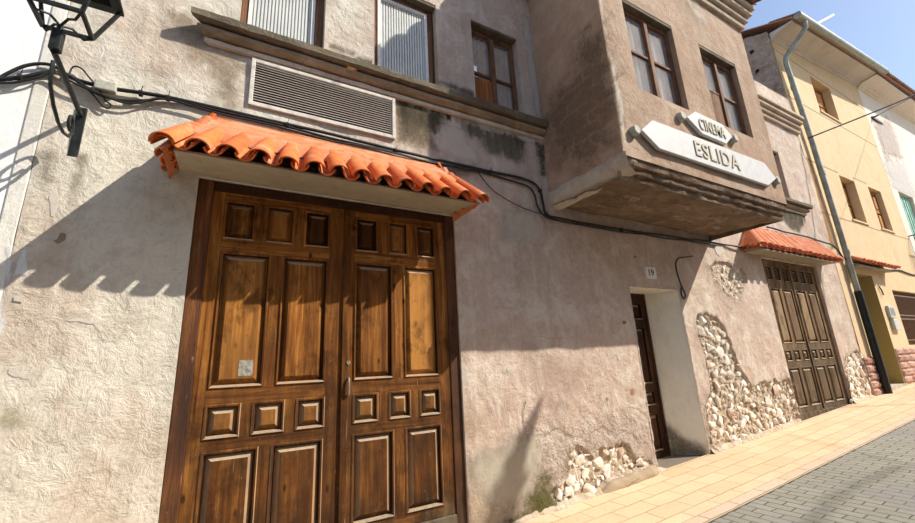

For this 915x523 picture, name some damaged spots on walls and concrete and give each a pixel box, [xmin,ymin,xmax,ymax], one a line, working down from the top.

damp [396,16,619,175]
spalling [686,241,747,300]
crack [522,401,641,447]
spalling [551,289,658,502]
spalling [678,291,801,451]
spalling [844,350,875,404]